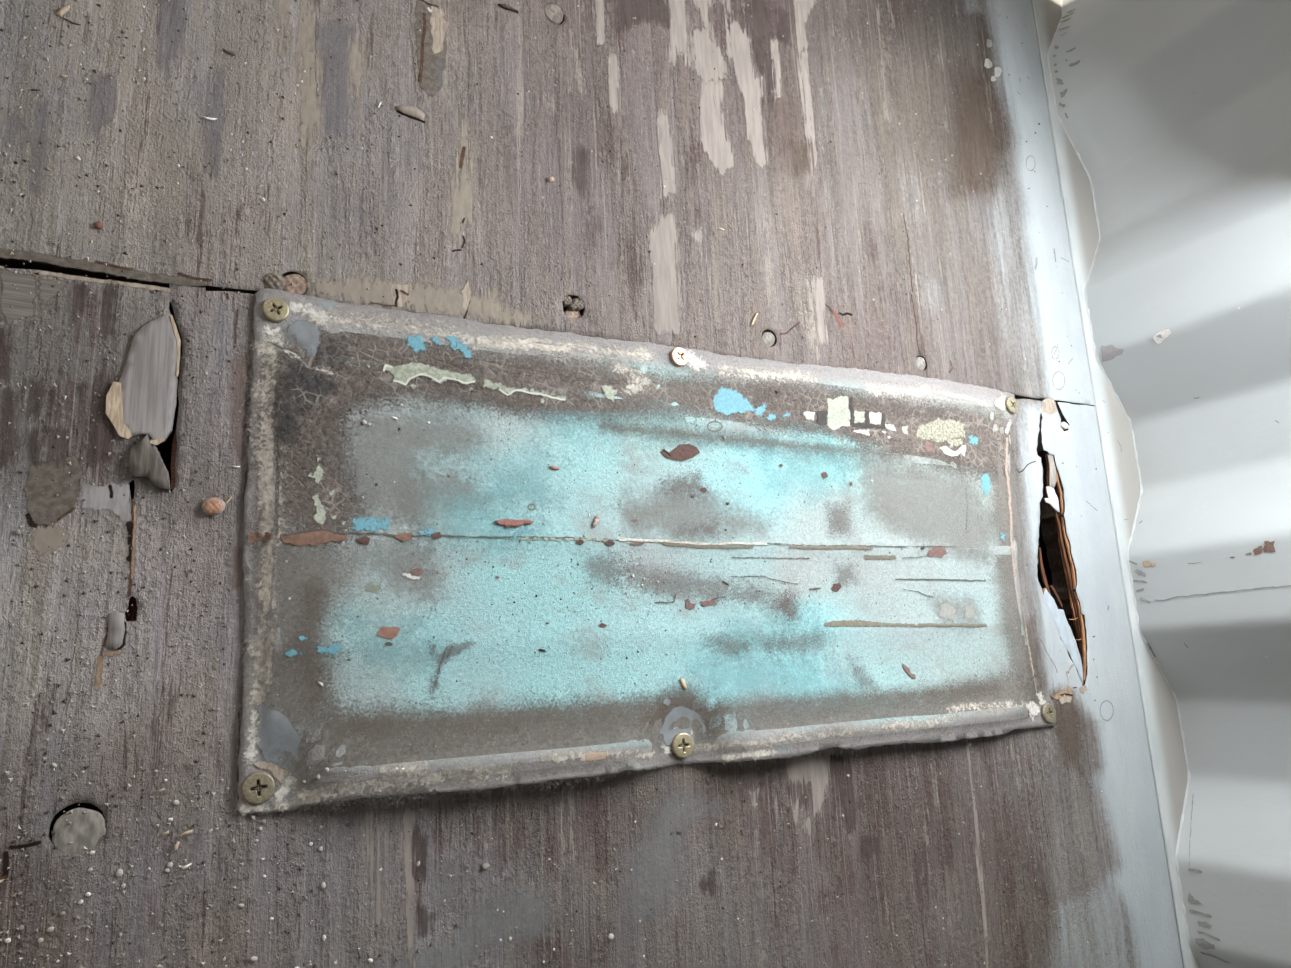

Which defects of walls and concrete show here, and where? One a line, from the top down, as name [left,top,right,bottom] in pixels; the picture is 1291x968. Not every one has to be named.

peeling [367,362,566,404]
peeling [601,385,617,402]
peeling [804,396,966,457]
peeling [661,444,700,461]
peeling [248,458,370,546]
peeling [395,533,412,542]
peeling [921,546,947,558]
corrosion [252,328,1043,800]
peeling [402,568,423,580]
peeling [655,594,725,609]
peeling [376,618,400,646]